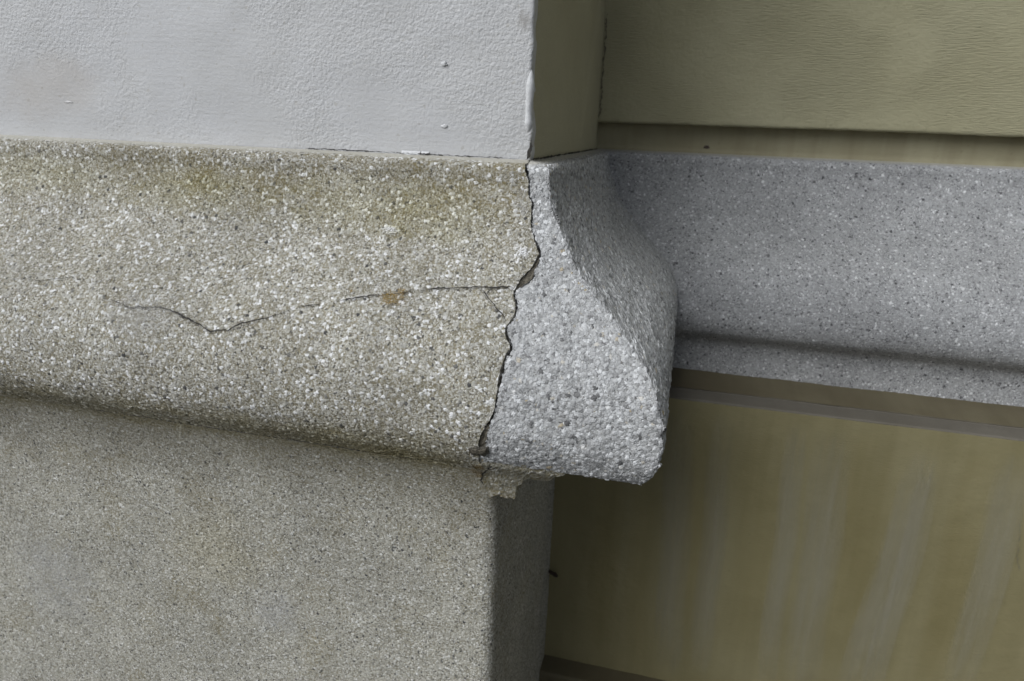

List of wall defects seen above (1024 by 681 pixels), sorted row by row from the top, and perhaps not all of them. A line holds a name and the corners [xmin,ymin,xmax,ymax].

crack [110,286,517,424]
spalling [468,424,565,499]